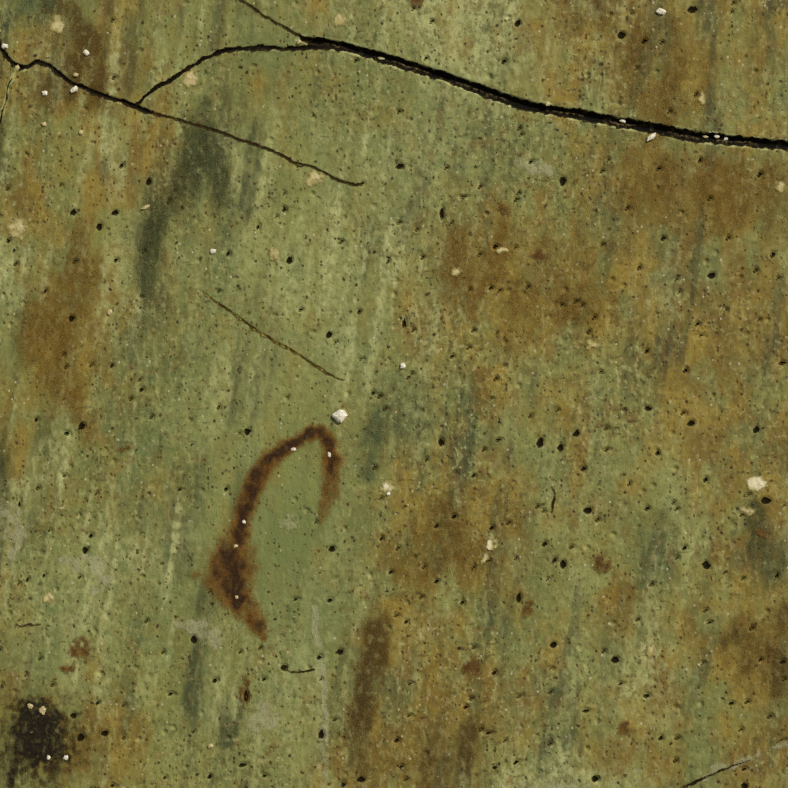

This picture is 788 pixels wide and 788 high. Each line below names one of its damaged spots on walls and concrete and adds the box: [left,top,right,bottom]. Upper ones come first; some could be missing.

crack [0,0,788,186]
crack [202,291,343,380]
corrosion [206,424,342,640]
leakage [0,694,83,788]